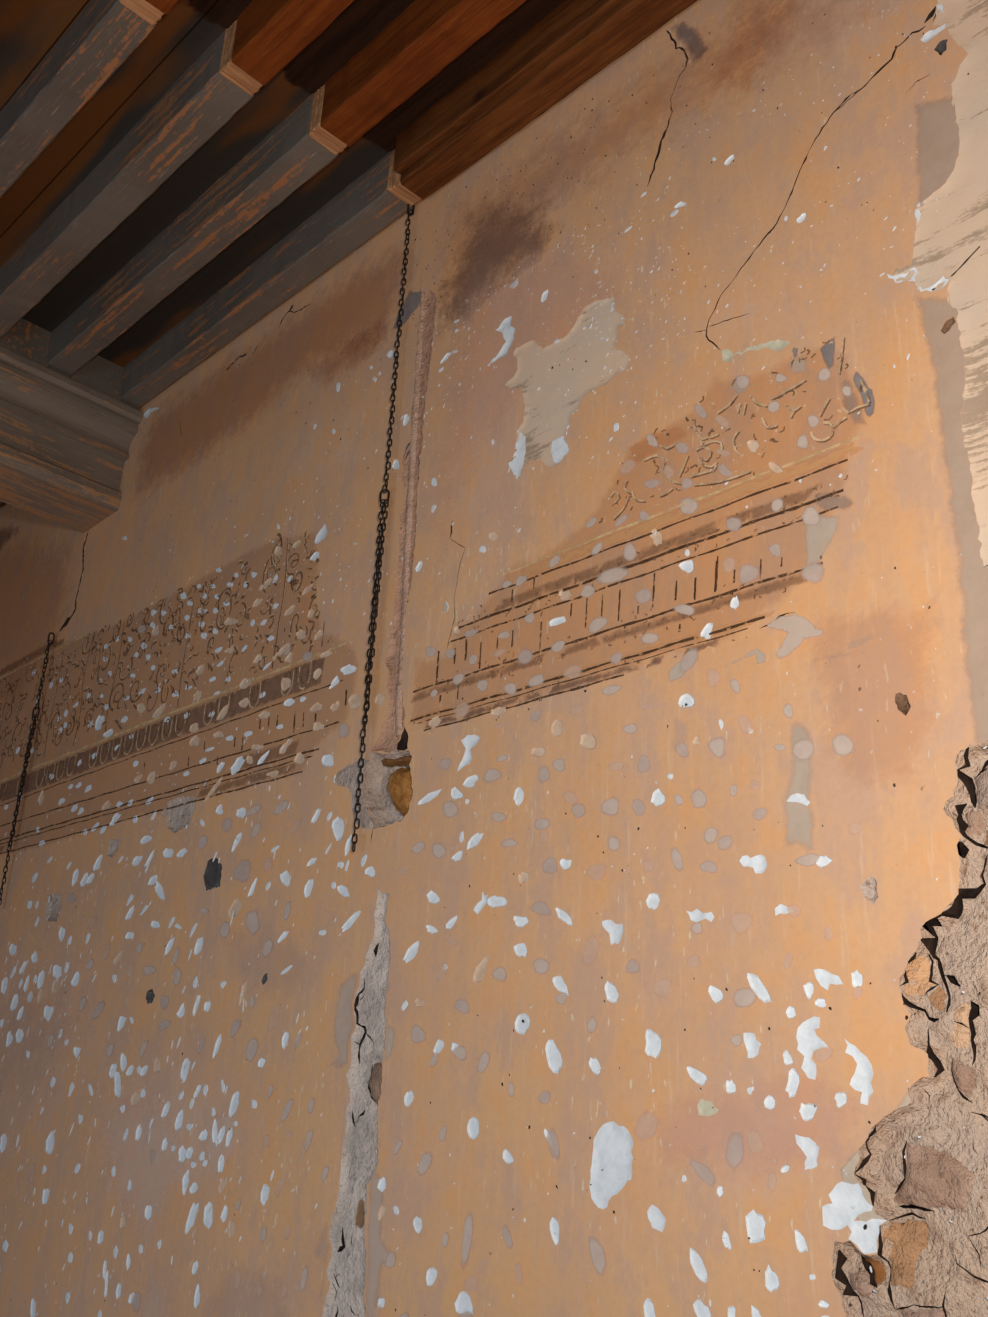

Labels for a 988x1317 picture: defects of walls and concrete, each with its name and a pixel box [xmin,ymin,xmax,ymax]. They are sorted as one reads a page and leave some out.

crack [647,30,689,186]
crack [697,6,937,350]
flaking render [887,0,988,568]
flaking render [488,297,631,479]
spalling [166,739,305,891]
spalling [311,726,412,856]
spalling [418,735,480,805]
spalling [895,692,911,716]
spalling [743,1033,761,1058]
spalling [747,973,771,1003]
spalling [764,969,863,1173]
spalling [589,1121,633,1209]